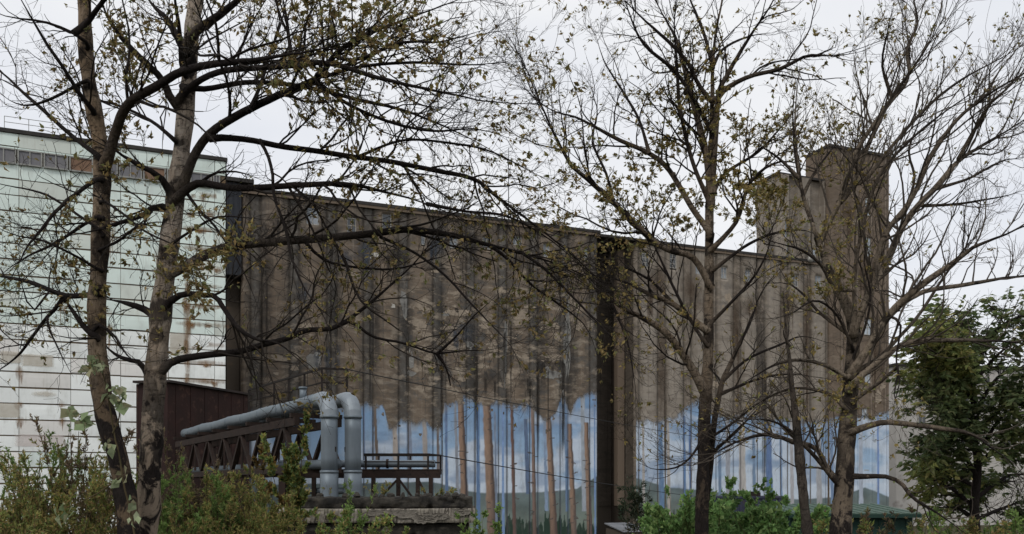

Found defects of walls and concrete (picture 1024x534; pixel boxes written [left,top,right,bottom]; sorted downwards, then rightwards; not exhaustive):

corrosion [183,289,210,345]
water stain [527,360,549,430]
water stain [562,344,574,433]